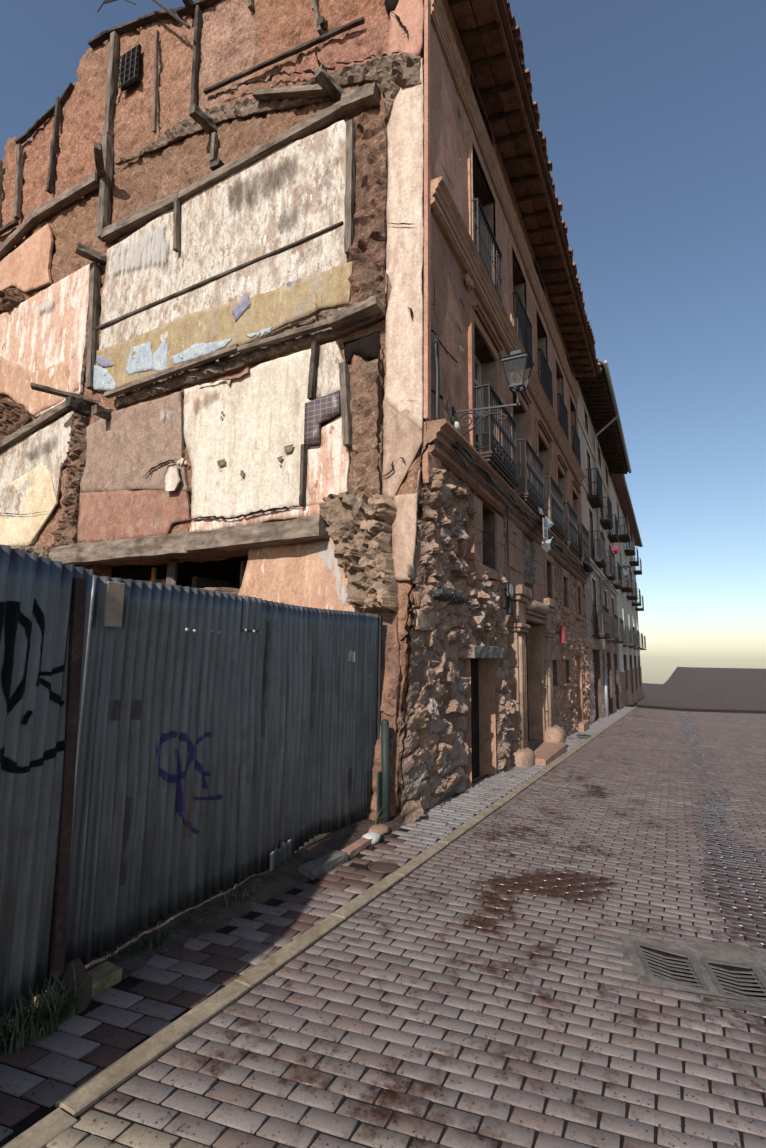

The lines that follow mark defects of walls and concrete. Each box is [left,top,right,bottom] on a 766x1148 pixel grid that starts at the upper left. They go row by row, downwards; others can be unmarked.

flaking render [0,463,58,547]
crack [399,574,425,791]